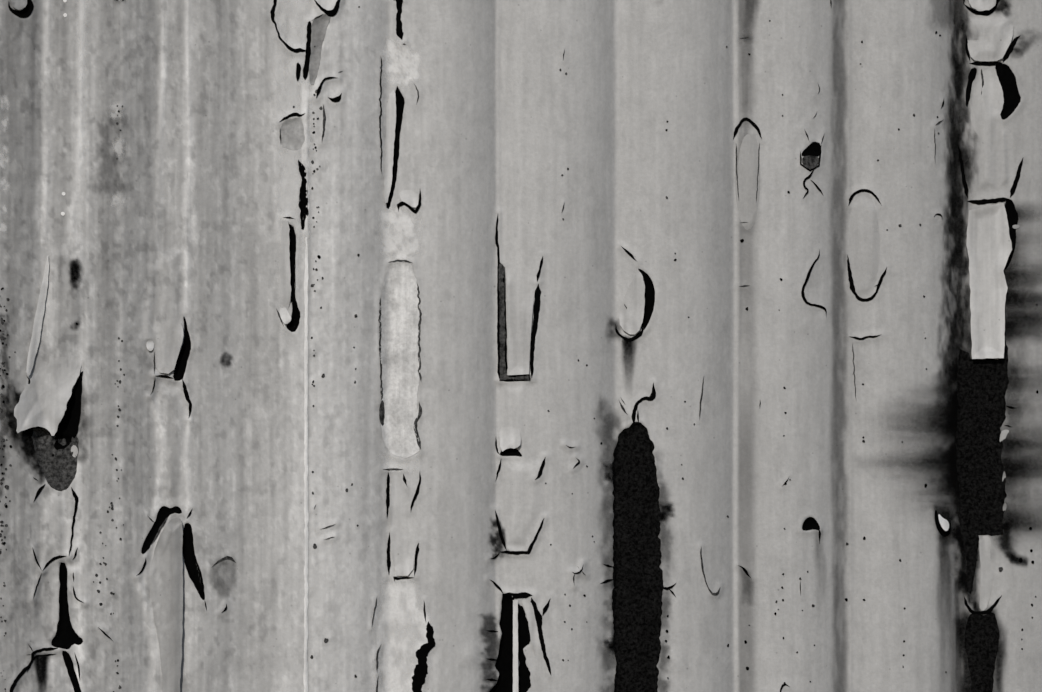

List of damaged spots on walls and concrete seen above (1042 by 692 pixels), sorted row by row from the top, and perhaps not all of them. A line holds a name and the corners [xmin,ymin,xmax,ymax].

peeling [0,256,85,692]
peeling [146,317,192,416]
peeling [276,13,330,332]
spalling [372,40,435,692]
peeling [495,427,522,481]
peeling [495,215,543,381]
peeling [610,246,655,363]
rust [600,383,677,692]
rust [907,268,1042,692]
peeling [958,146,1023,359]
peeling [963,0,1027,150]
peeling [513,600,542,692]